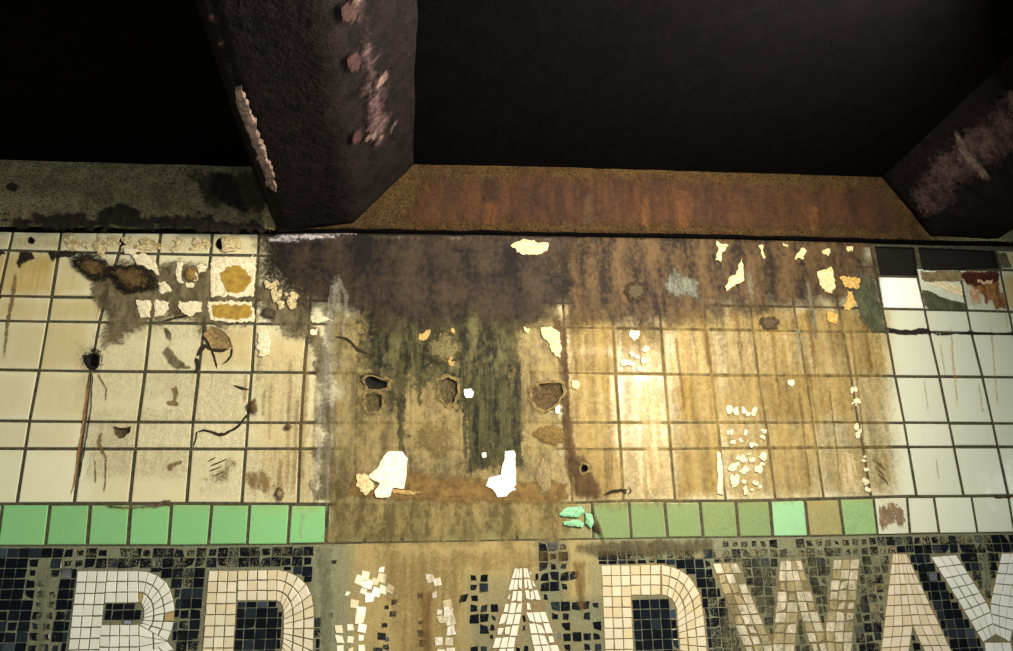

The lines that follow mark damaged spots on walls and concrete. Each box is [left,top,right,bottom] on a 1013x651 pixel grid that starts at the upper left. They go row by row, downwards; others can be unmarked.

damp [1,172,357,243]
peeling [66,233,161,256]
peeling [136,281,172,318]
peeling [186,255,299,349]
damp [665,268,698,298]
rust [961,270,1007,309]
rust [71,373,93,493]
crack [193,336,249,447]
peeling [356,473,375,496]
damp [326,282,889,543]
peeling [726,405,757,416]
peeling [727,429,767,495]